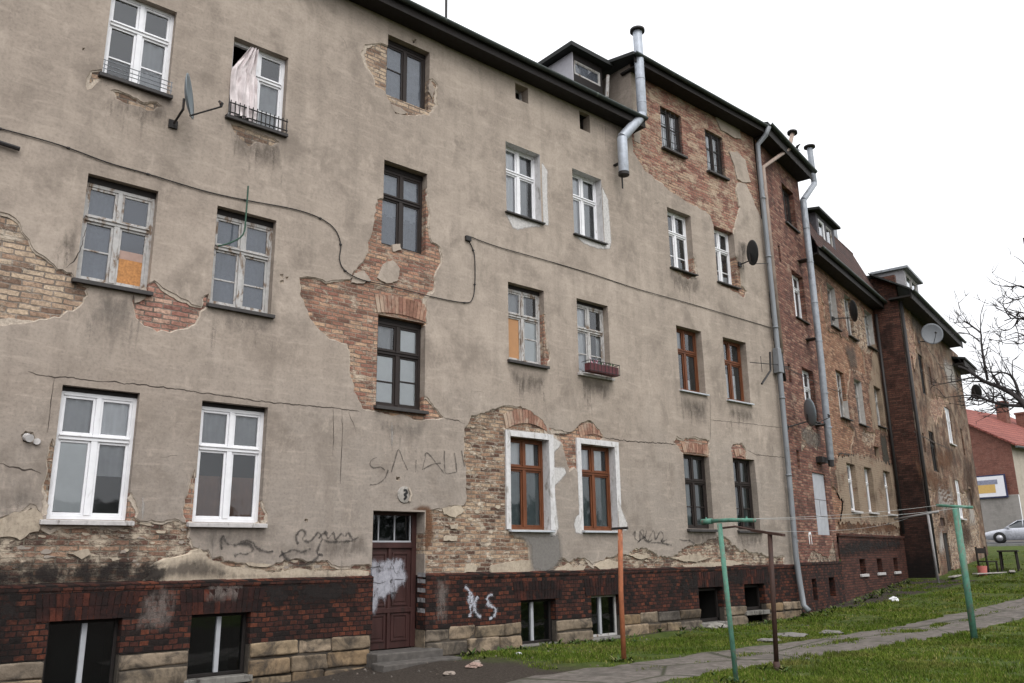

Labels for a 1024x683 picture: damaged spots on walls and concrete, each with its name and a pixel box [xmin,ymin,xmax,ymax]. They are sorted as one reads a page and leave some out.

flaking render [361,43,438,116]
flaking render [632,80,761,236]
flaking render [0,212,89,326]
flaking render [132,280,210,333]
flaking render [280,188,444,421]
crack [28,371,356,483]
flaking render [0,439,372,585]
flaking render [416,405,604,574]
flaking render [550,536,785,571]